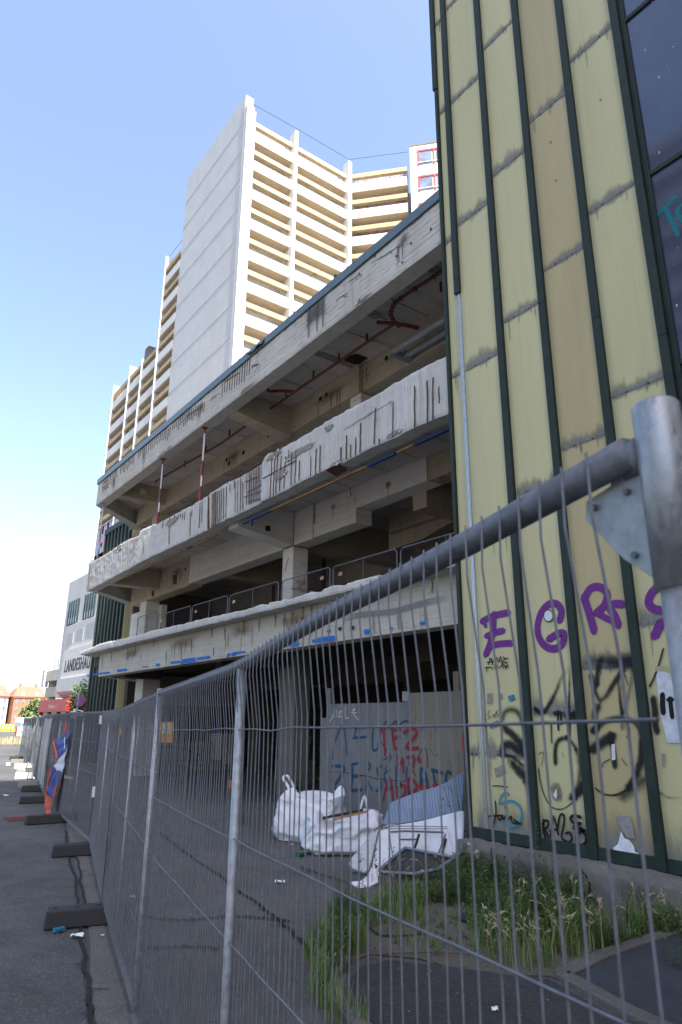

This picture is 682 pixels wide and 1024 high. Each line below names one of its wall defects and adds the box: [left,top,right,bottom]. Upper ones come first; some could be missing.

water stain [571,24,611,62]
water stain [530,88,565,123]
water stain [493,147,524,177]
water stain [590,181,635,214]
water stain [544,243,583,271]
water stain [307,296,324,337]